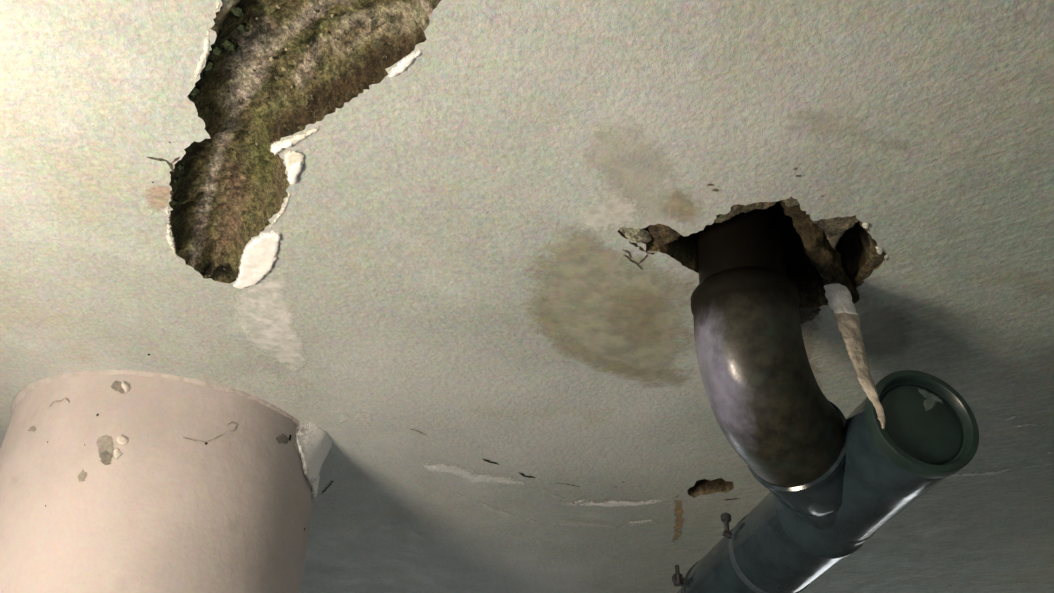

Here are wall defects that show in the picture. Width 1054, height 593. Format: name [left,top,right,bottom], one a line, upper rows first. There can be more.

spalling [166,0,441,289]
hole [617,223,699,273]
hole [714,197,889,324]
spalling [276,422,332,498]
crack [483,459,579,487]